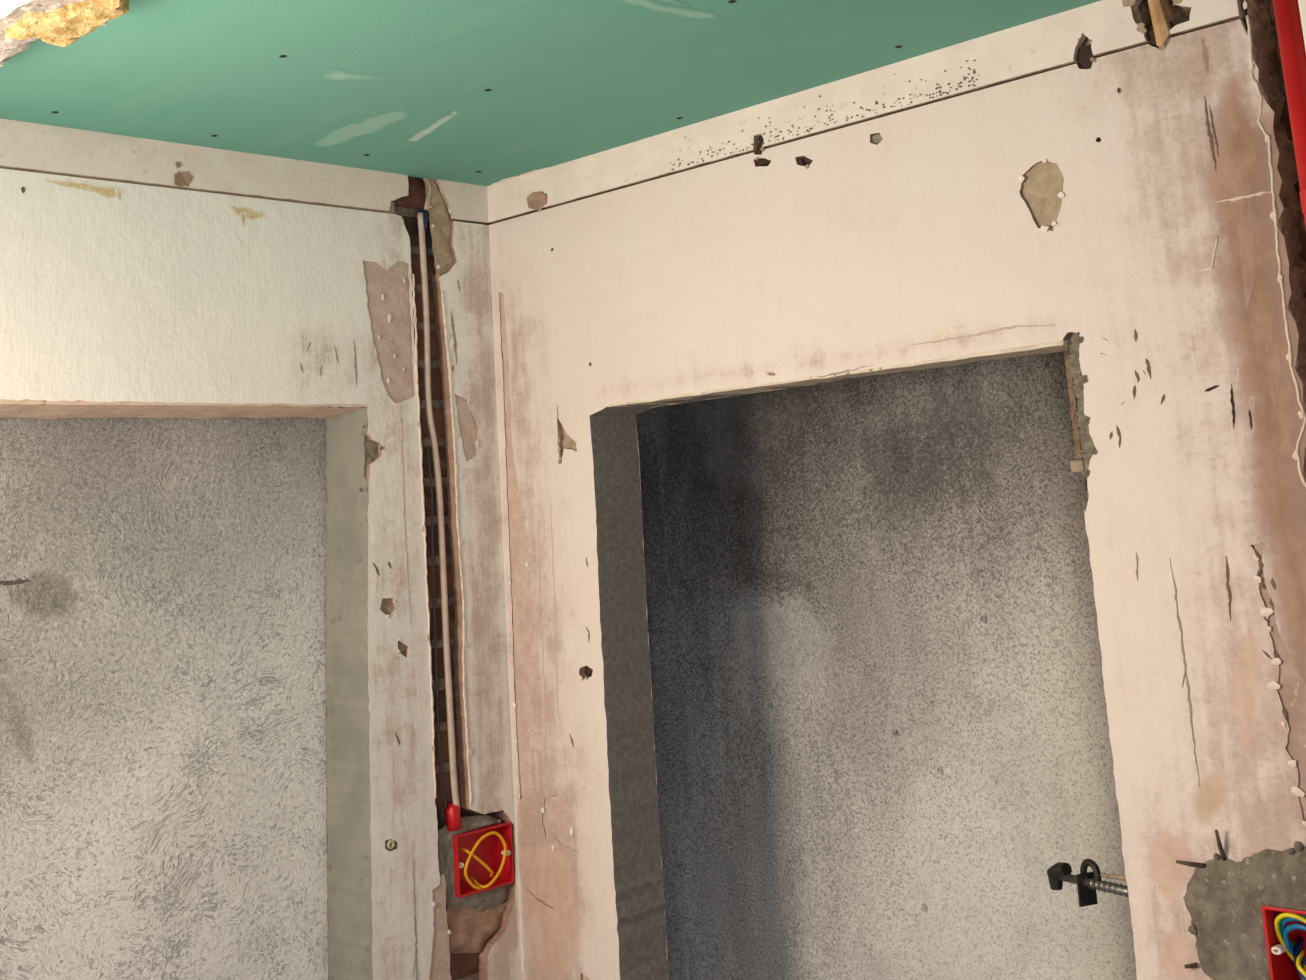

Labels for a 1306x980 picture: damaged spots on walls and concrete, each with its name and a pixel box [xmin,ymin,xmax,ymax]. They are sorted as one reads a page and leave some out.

spalling [1122,0,1153,34]
spalling [1168,0,1191,20]
spalling [1018,159,1065,232]
spalling [1067,332,1097,504]
spalling [1121,359,1151,405]
flaking render [363,176,479,809]
crack [0,578,30,586]
crack [1170,561,1200,787]